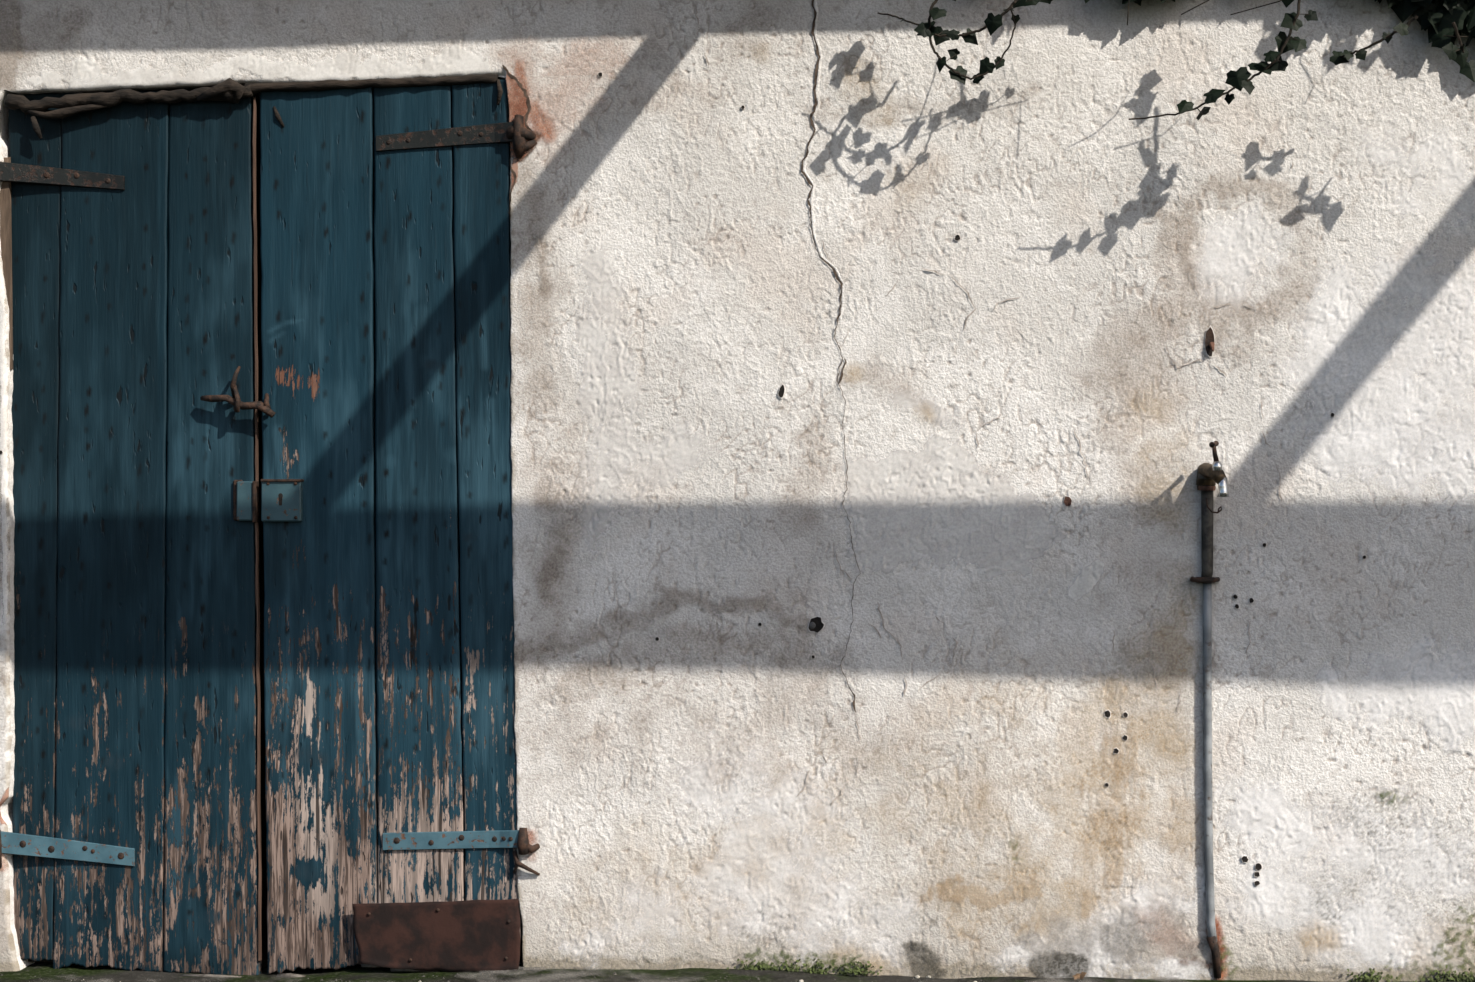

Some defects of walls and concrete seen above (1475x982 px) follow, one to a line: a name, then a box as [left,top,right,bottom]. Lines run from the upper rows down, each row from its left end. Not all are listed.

rust [508,61,553,161]
crack [786,0,958,806]